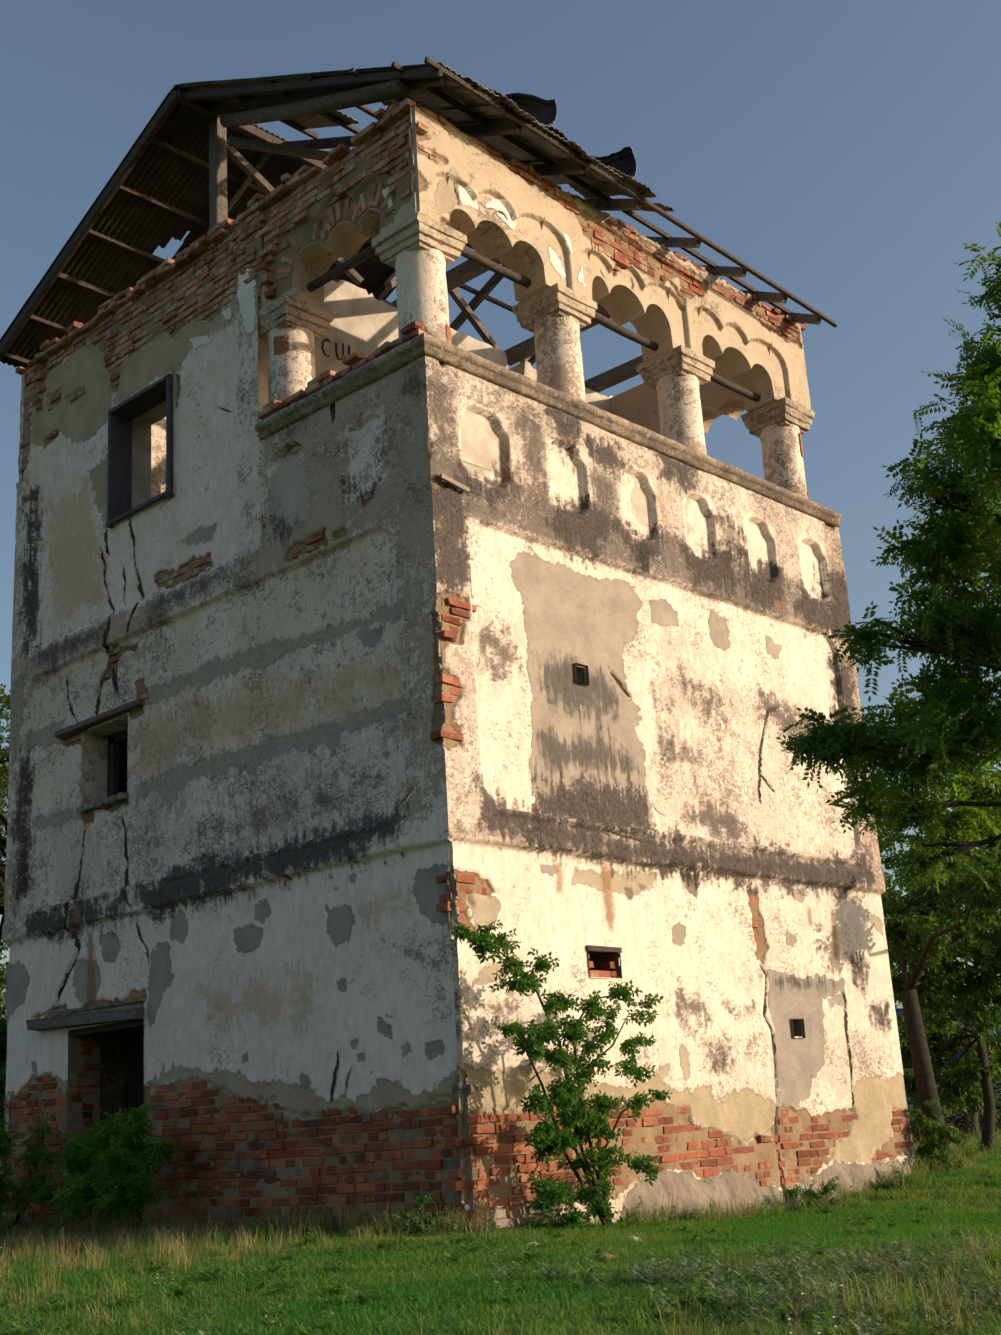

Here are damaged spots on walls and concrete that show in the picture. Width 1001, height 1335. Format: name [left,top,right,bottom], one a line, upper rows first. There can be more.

spalling [18,111,459,482]
crack [58,831,86,1007]
crack [66,519,144,723]
water stain [9,747,409,947]
spalling [430,589,477,751]
peeling [412,863,501,940]
water stain [400,361,859,724]
water stain [471,658,876,906]
crack [745,707,776,833]
spalling [2,1061,70,1231]
spalling [145,887,914,1231]
crack [760,966,789,1202]